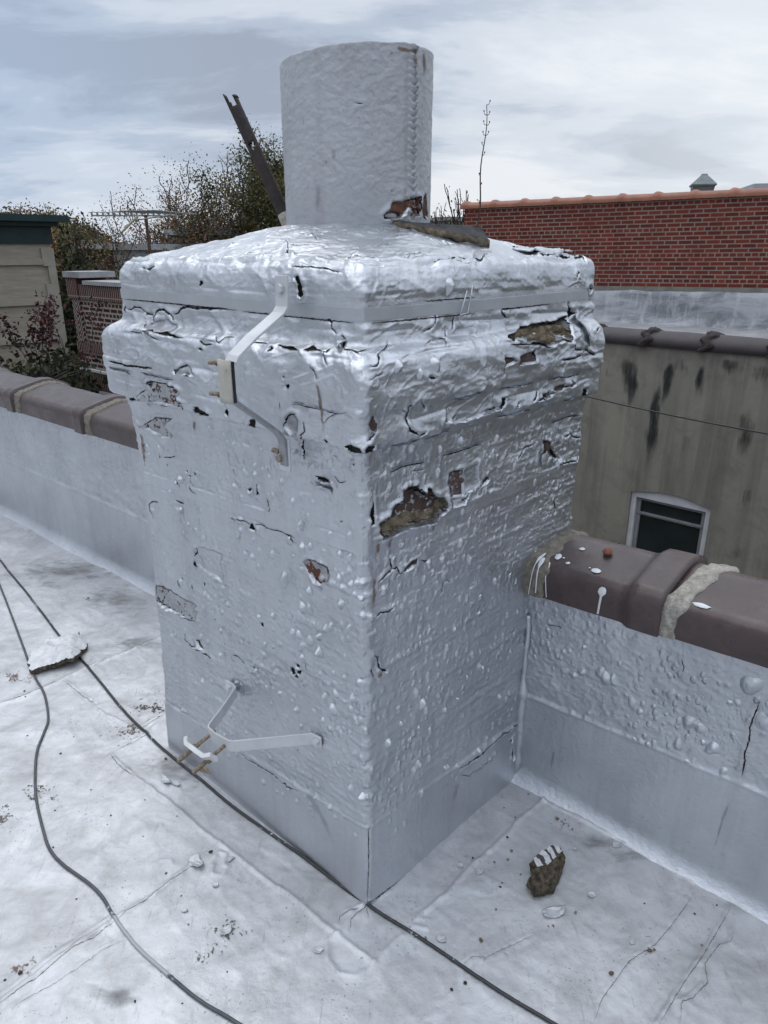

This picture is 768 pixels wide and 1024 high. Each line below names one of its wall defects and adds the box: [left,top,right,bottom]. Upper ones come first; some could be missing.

peeling [387,194,428,220]
crack [124,306,226,339]
crack [310,319,388,380]
spalling [505,313,591,367]
crack [564,328,599,361]
crack [109,361,152,398]
damp [623,363,637,398]
damp [648,365,673,447]
spalling [379,465,490,540]
peeling [303,559,329,592]
peeling [155,586,197,620]
crack [740,702,760,779]